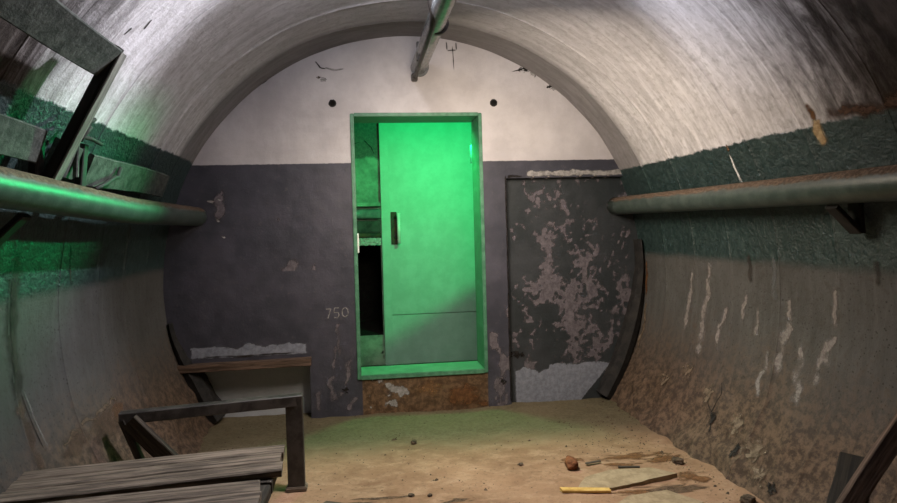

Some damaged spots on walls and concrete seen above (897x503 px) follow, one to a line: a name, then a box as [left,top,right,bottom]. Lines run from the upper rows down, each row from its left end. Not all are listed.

rust [805,105,827,144]
peeling [190,342,307,359]
peeling [489,169,631,406]
damp [684,272,693,328]
damp [696,266,711,354]
damp [715,308,728,344]
damp [755,300,793,394]
damp [793,347,803,402]
damp [814,290,837,383]